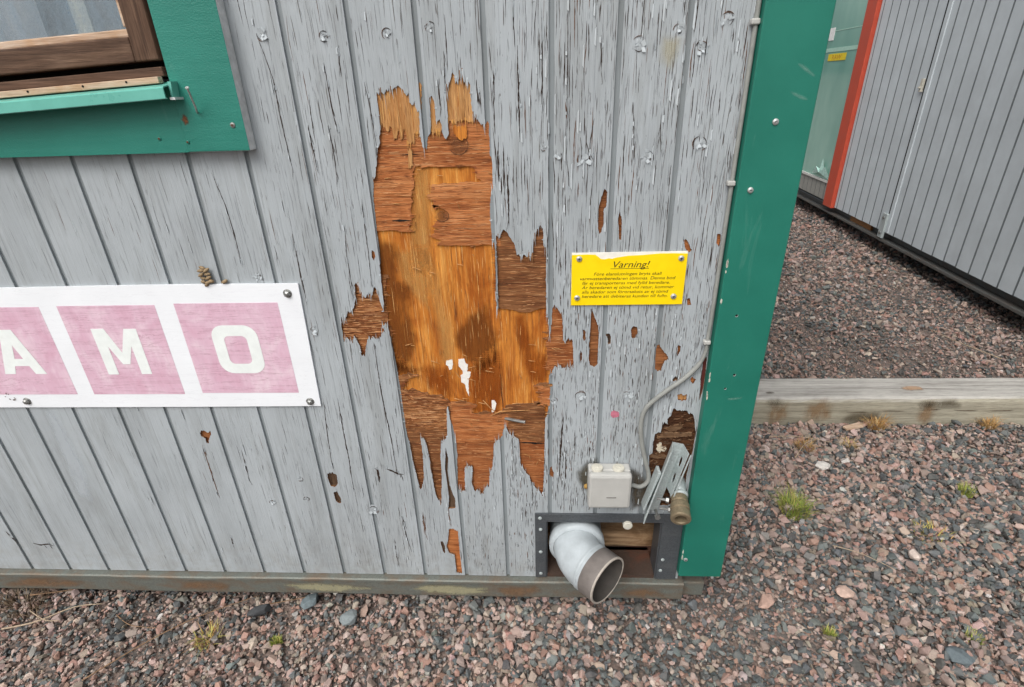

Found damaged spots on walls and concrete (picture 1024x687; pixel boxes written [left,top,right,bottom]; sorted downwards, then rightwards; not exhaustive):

peeling [598,189,607,233]
peeling [446,359,471,395]
peeling [580,309,611,366]
peeling [655,344,680,370]
peeling [649,424,692,459]
peeling [328,472,341,502]
peeling [445,451,455,507]
peeling [441,528,462,572]